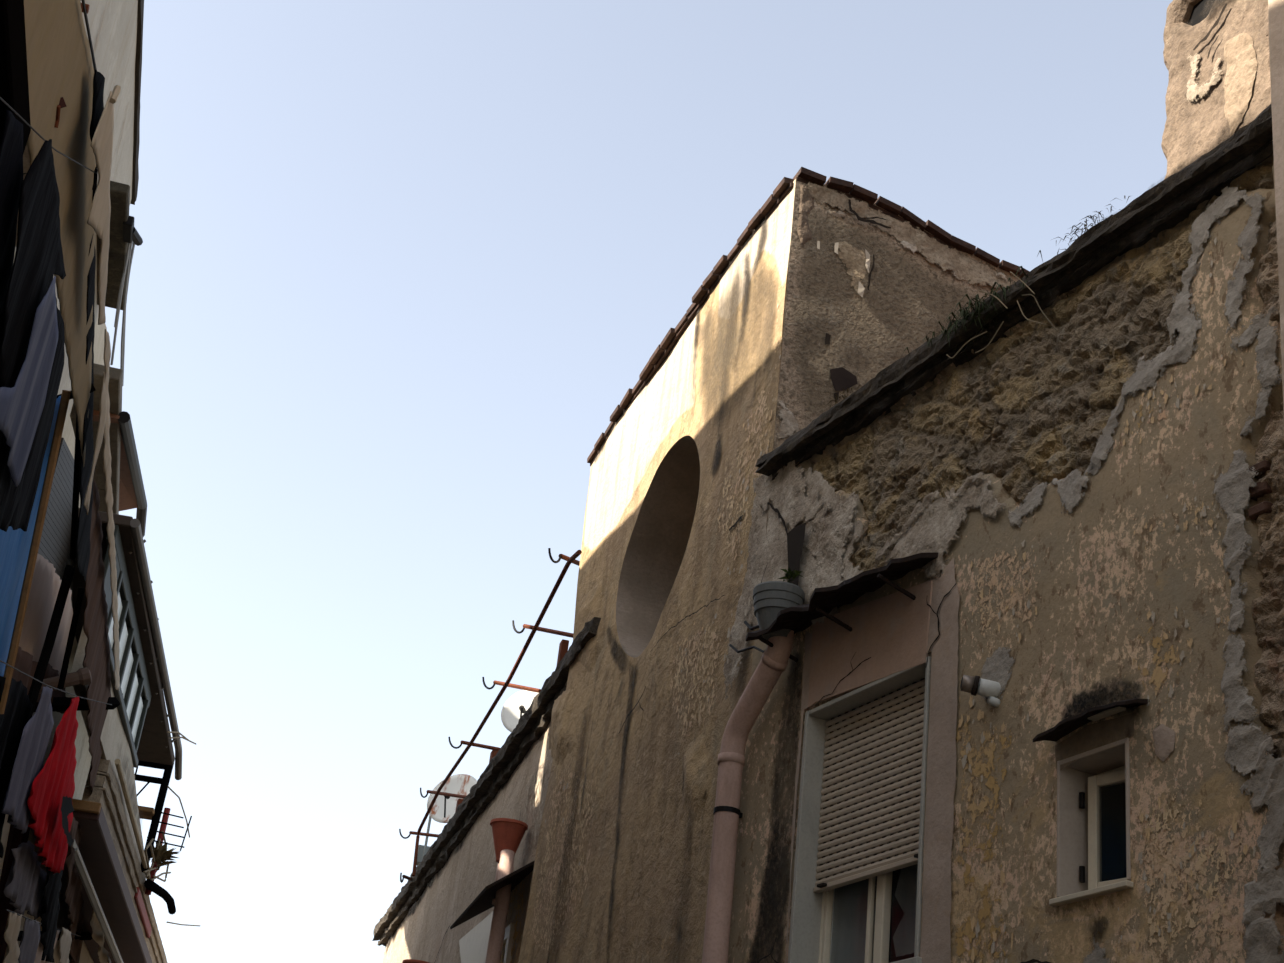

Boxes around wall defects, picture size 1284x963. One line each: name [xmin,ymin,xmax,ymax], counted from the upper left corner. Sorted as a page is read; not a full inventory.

peeling [797,184,875,298]
crack [848,199,891,229]
water stain [693,217,773,412]
water stain [712,440,721,474]
peeling [1133,466,1227,550]
peeling [1122,348,1244,457]
peeling [665,388,864,754]
crack [925,584,956,668]
water stain [607,627,637,963]